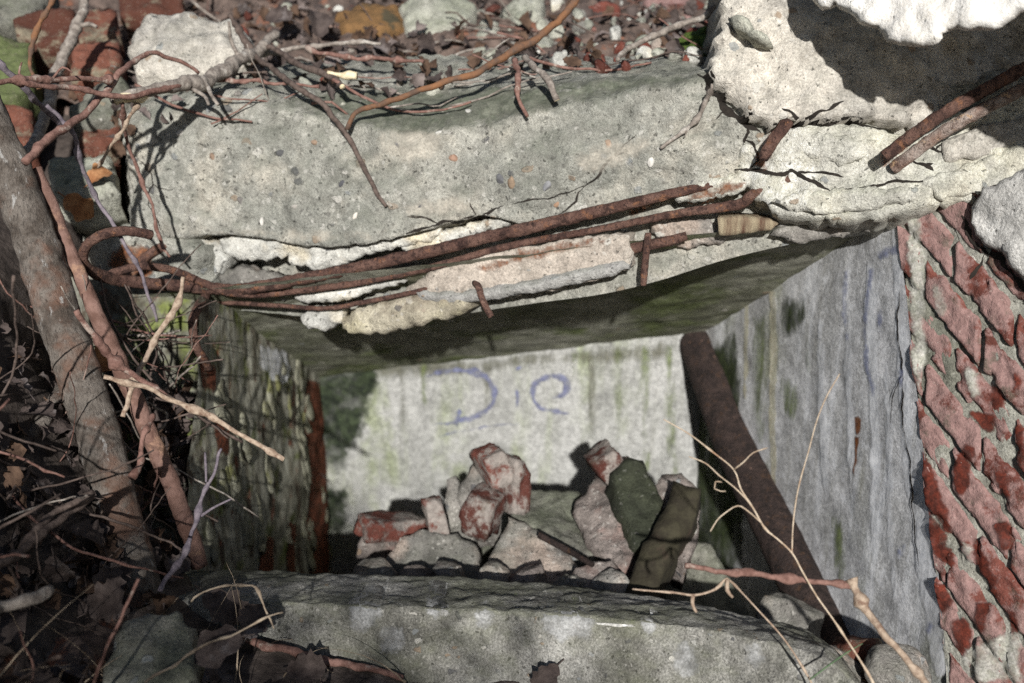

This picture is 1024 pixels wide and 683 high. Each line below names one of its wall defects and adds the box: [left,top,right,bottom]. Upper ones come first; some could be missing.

spalling [402,135,439,159]
crack [406,135,636,234]
rust [688,183,743,203]
spalling [758,118,793,162]
crack [698,70,942,191]
spalling [771,62,1024,244]
leakage [260,346,291,384]
spalling [78,172,763,574]
leakage [769,291,777,484]
rust [852,417,861,473]